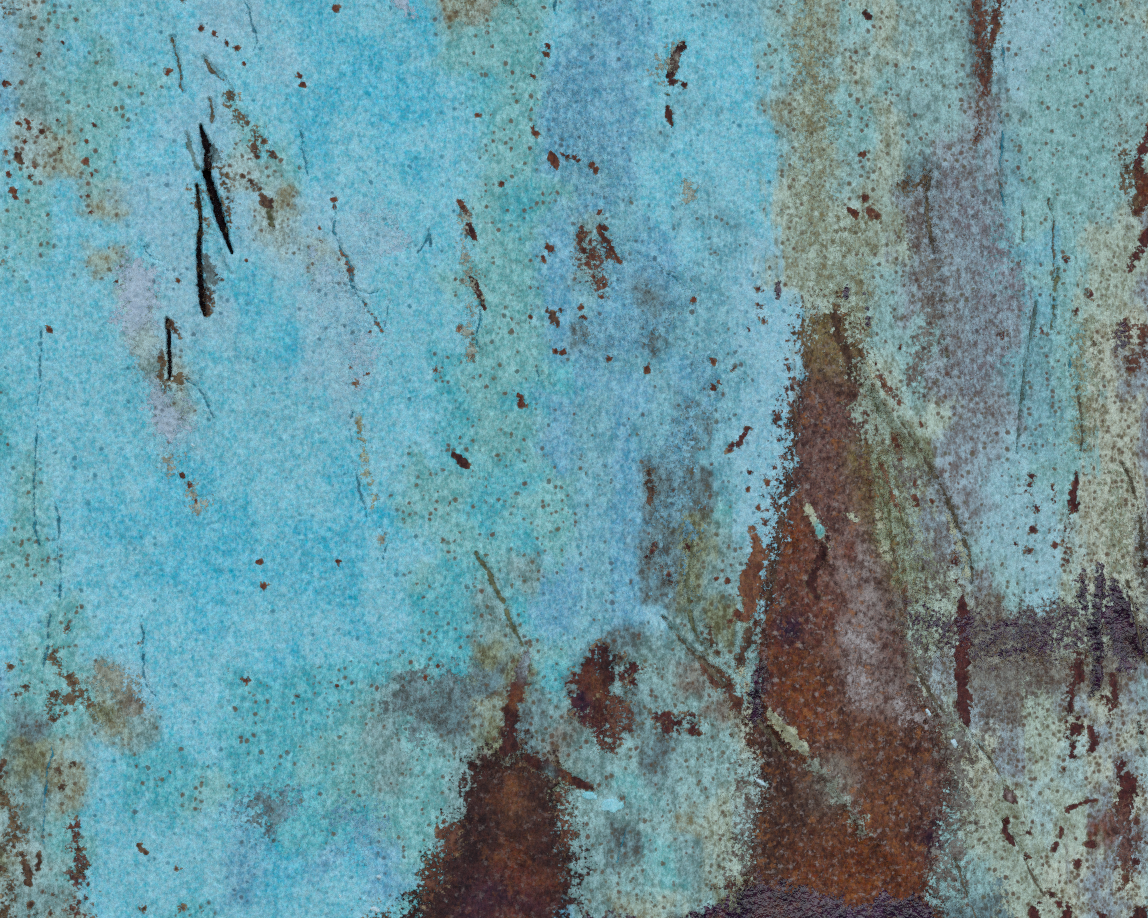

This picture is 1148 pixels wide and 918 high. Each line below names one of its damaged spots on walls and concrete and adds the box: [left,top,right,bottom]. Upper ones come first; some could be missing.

corrosion [969,0,1007,150]
crack [153,318,214,418]
crack [143,37,309,318]
corrosion [528,303,588,328]
corrosion [570,209,625,300]
corrosion [1112,122,1148,273]
corrosion [451,451,471,469]
corrosion [680,280,1148,918]
corrosion [44,645,94,726]
corrosion [556,630,706,758]
corrosion [0,758,101,918]
corrosion [351,648,636,918]